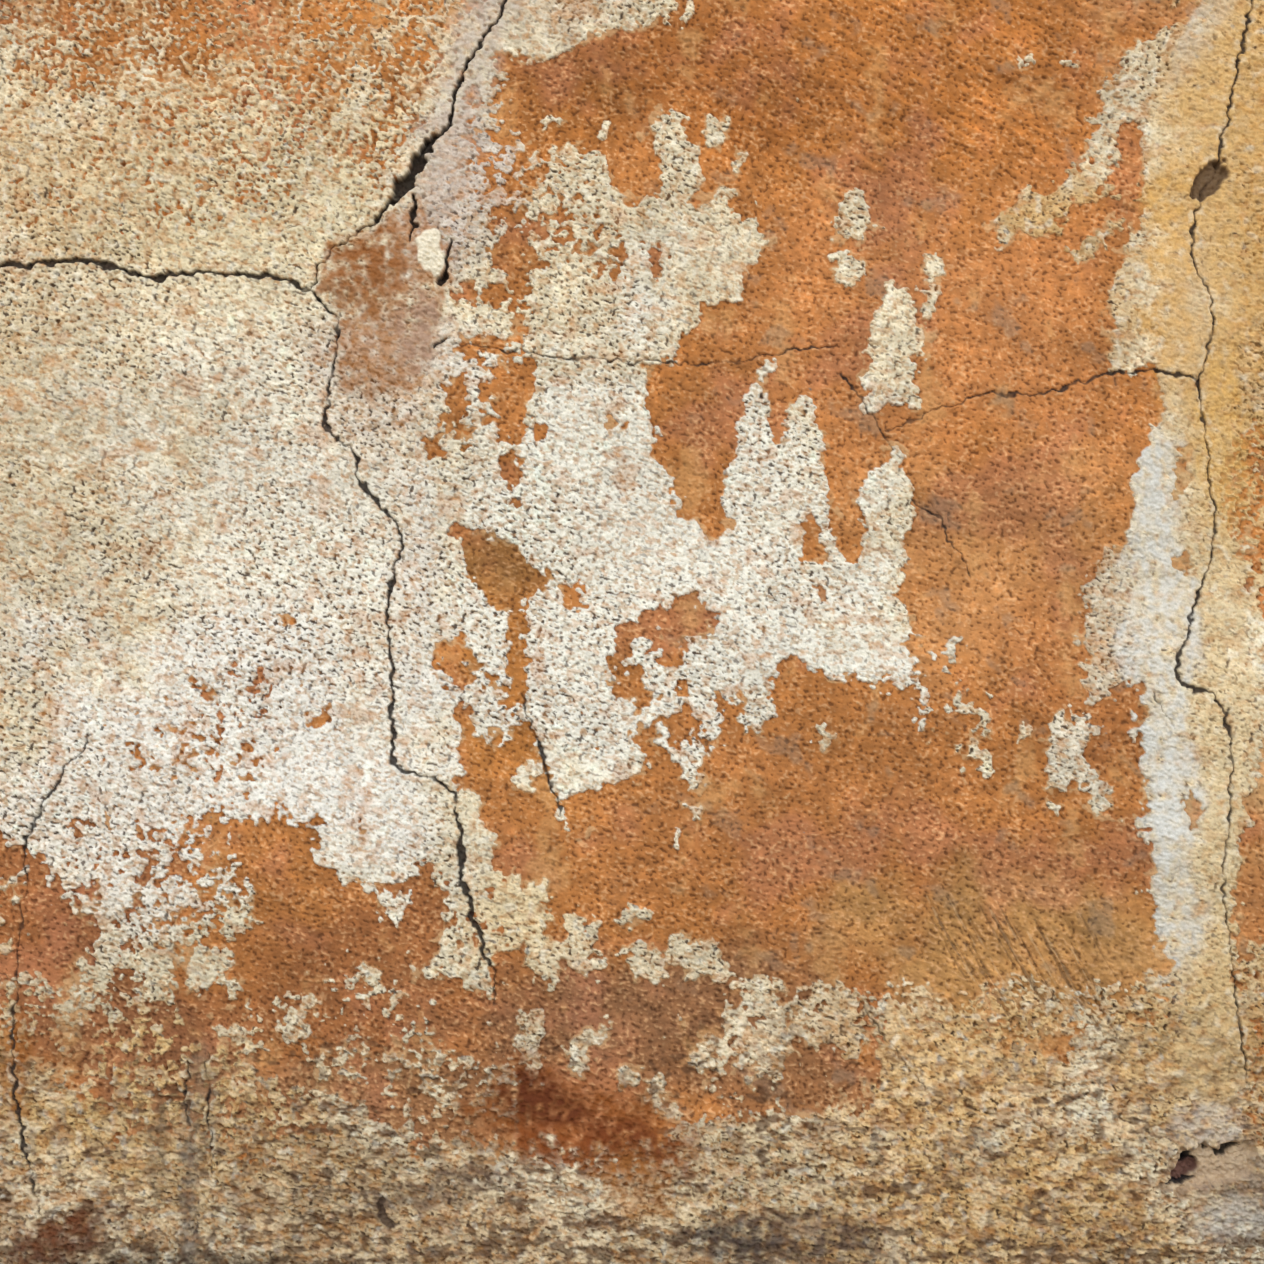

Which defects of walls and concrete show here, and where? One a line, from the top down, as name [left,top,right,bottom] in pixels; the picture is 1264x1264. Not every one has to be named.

crack [1218,0,1254,161]
peeling [421,373,478,461]
crack [0,0,508,1007]
peeling [432,0,1196,1125]
peeling [174,678,225,759]
peeling [242,742,260,782]
peeling [247,673,266,698]
crack [433,203,1252,1102]
crack [0,734,93,1217]
peeling [0,808,505,1142]
flaking render [1165,1150,1199,1186]
spalling [1211,1142,1240,1156]